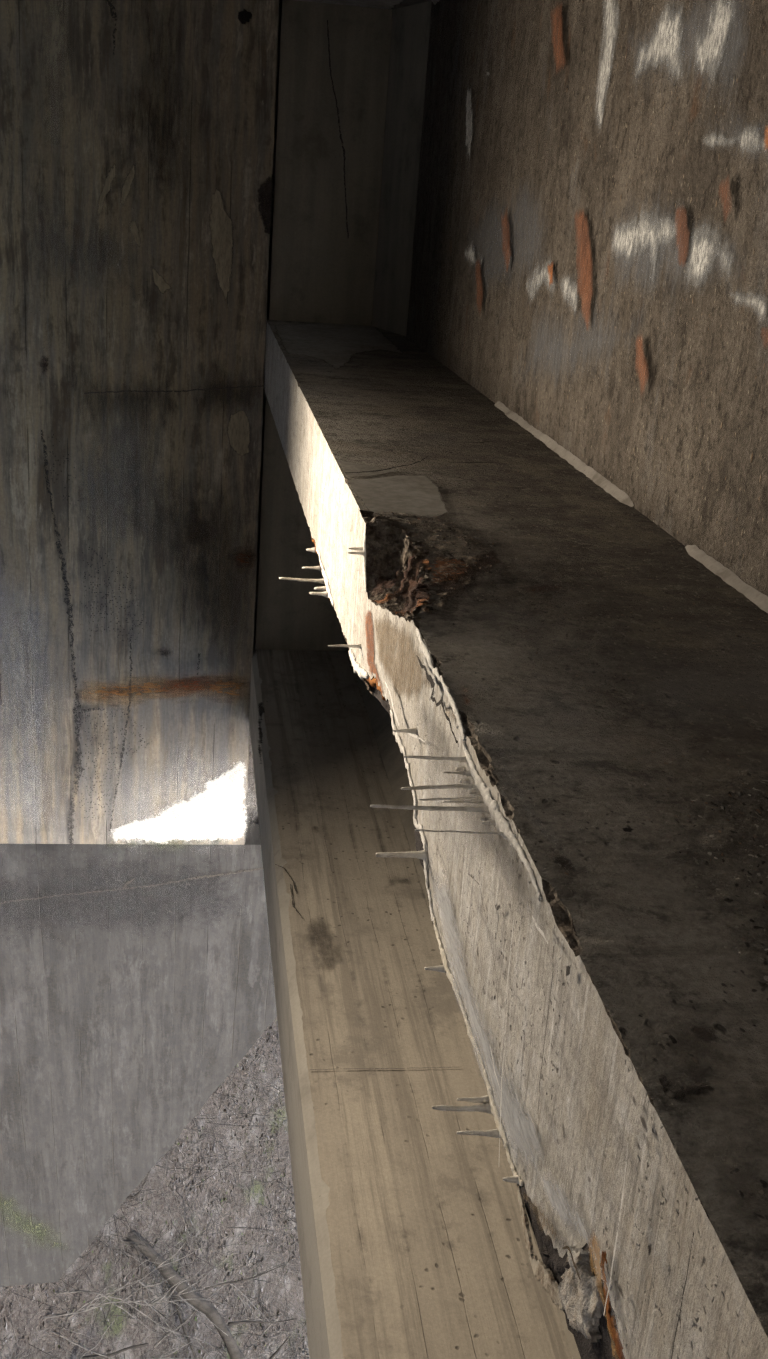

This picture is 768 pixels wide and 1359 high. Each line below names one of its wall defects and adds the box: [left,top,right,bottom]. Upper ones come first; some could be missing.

crack [327,20,349,238]
spalling [338,459,500,628]
crack [41,430,133,849]
corrosion [84,677,245,700]
corrosion [365,610,382,693]
crack [416,655,459,747]
crack [0,864,303,919]
spalling [517,1184,625,1359]
corrosion [589,1235,606,1317]